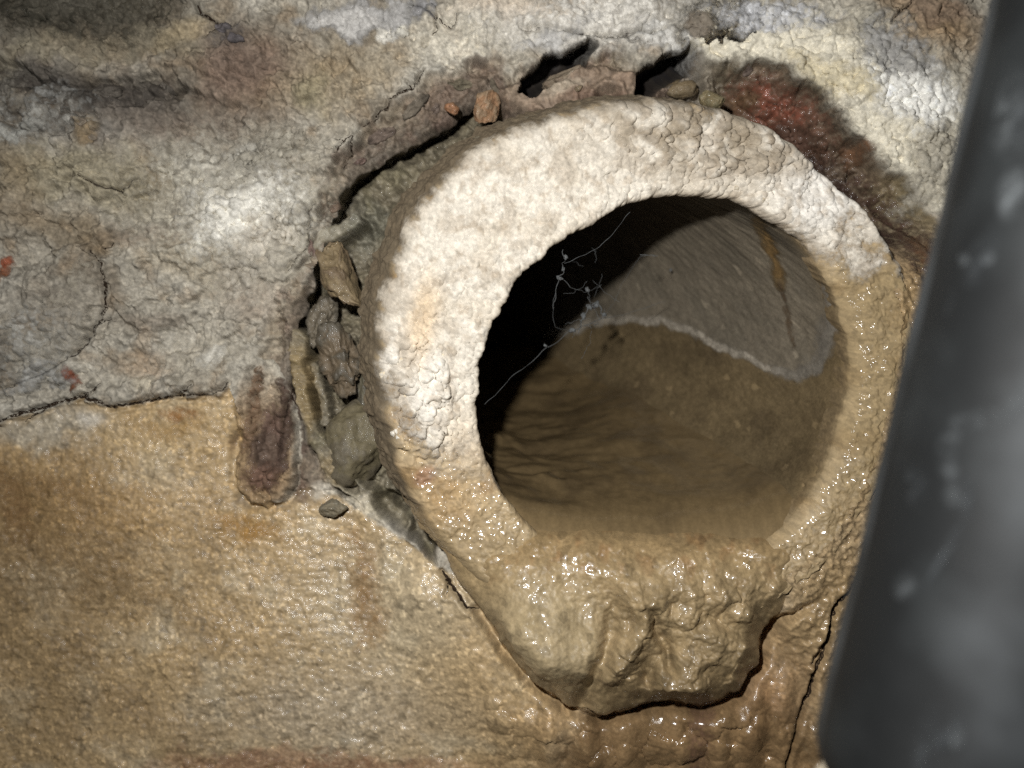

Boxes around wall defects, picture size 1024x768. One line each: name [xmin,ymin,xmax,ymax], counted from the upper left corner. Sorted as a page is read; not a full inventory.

crack [5,243,116,389]
crack [0,382,228,422]
flaking render [247,47,667,384]
flaking render [656,12,938,243]
rust [724,70,932,279]
damp [442,529,821,768]
crack [794,593,847,734]